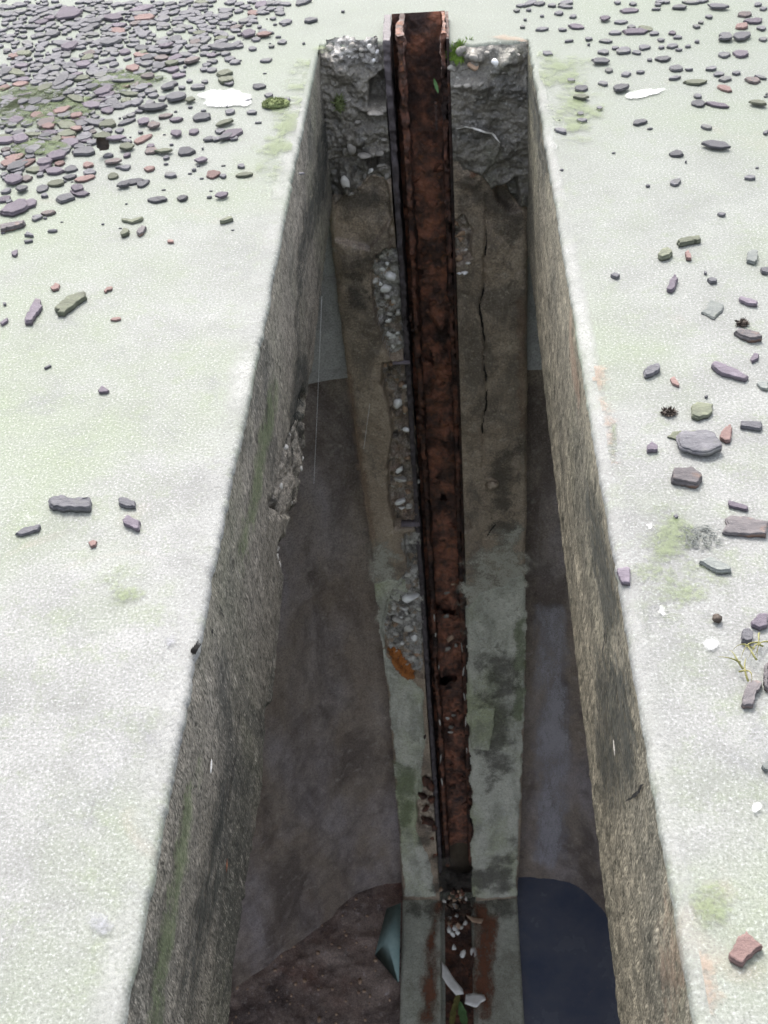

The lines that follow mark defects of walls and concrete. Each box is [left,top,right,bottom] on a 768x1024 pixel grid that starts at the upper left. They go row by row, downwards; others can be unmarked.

spalling [447,42,523,88]
peeling [454,123,502,177]
crack [479,287,488,434]
spalling [267,420,306,514]
corrosion [388,647,415,680]
water stain [466,646,518,791]
water stain [407,856,514,919]
corrosion [420,902,442,1024]